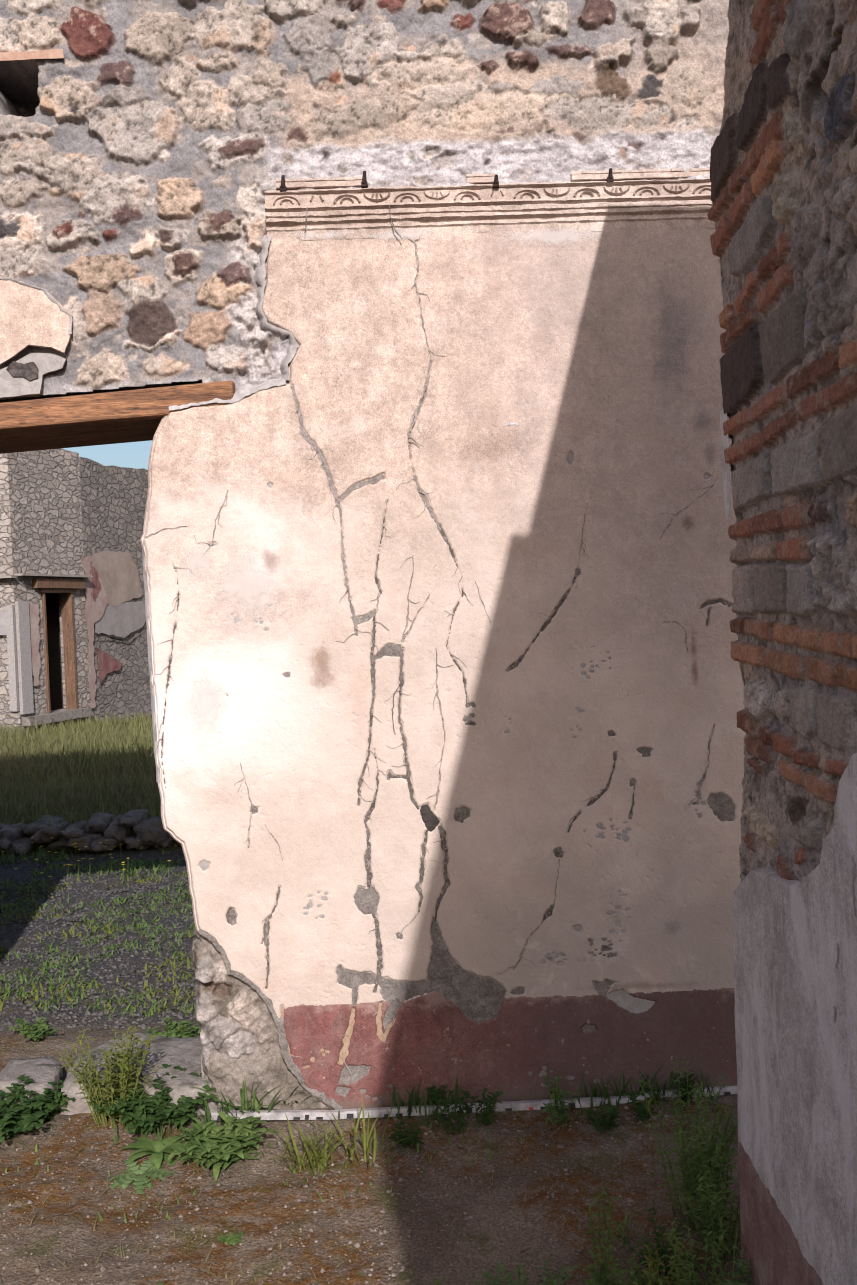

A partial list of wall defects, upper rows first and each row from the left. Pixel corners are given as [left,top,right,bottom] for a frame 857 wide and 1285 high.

flaking render [6,361,39,381]
crack [97,490,228,788]
crack [290,181,491,1076]
crack [506,503,590,672]
crack [234,763,304,1059]
spalling [336,916,525,1032]
crack [495,753,635,974]
spalling [592,979,655,1014]
spalling [692,782,735,821]